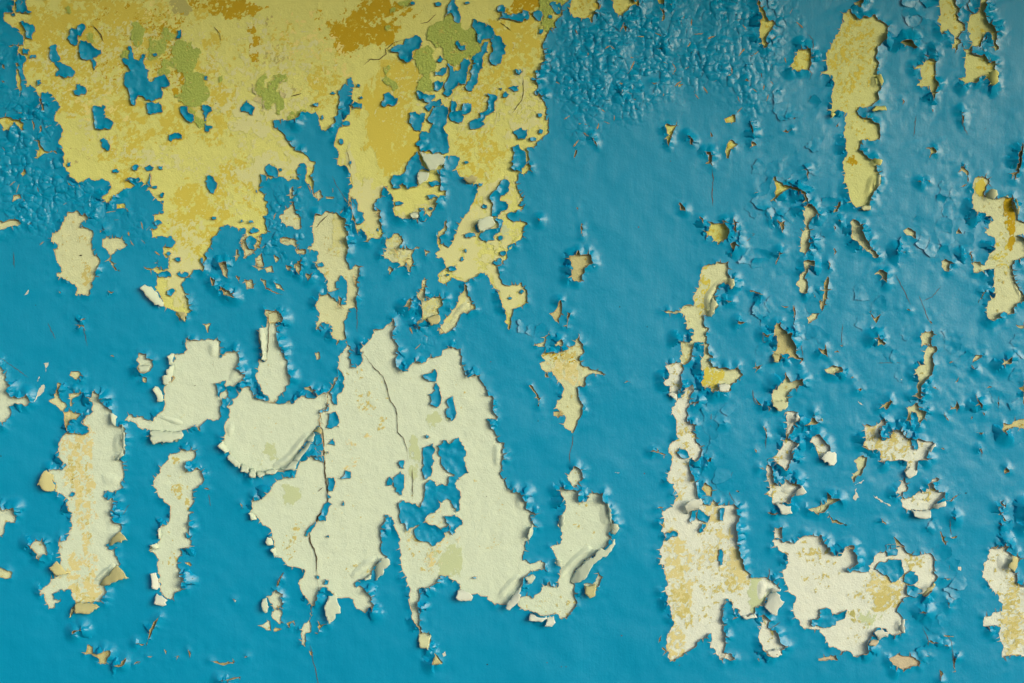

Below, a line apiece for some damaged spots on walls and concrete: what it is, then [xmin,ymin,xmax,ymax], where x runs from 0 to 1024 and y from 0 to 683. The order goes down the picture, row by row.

peeling [0,0,639,667]
peeling [652,0,983,677]
peeling [897,165,1024,329]
peeling [982,500,1024,660]